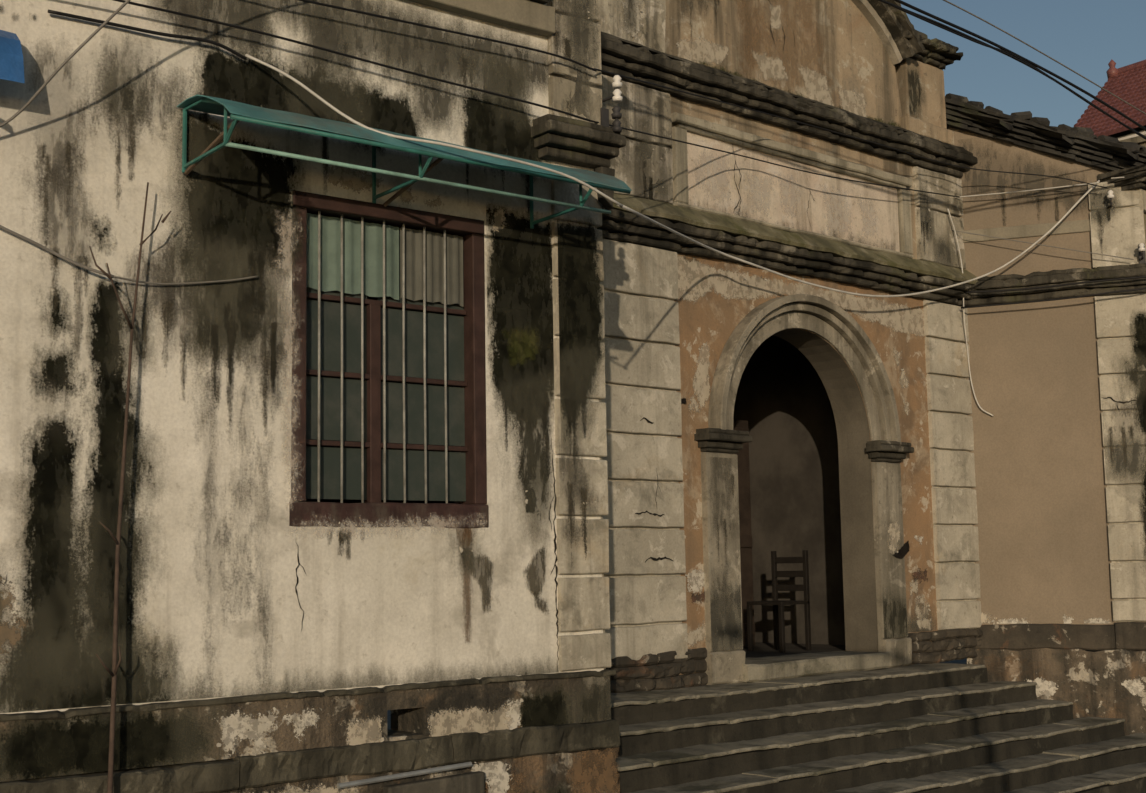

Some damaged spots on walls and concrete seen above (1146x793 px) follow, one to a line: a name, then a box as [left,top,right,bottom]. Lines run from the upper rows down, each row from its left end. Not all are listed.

damp [196,0,545,163]
flaking render [677,256,924,337]
damp [486,174,603,528]
damp [0,108,303,780]
damp [1108,313,1146,558]
crack [295,543,306,630]
flaking render [214,707,322,757]
flaking render [346,718,384,745]
flaking render [427,698,523,737]
damp [520,684,611,727]
flaking render [1026,677,1059,698]
flaking render [1121,679,1145,709]